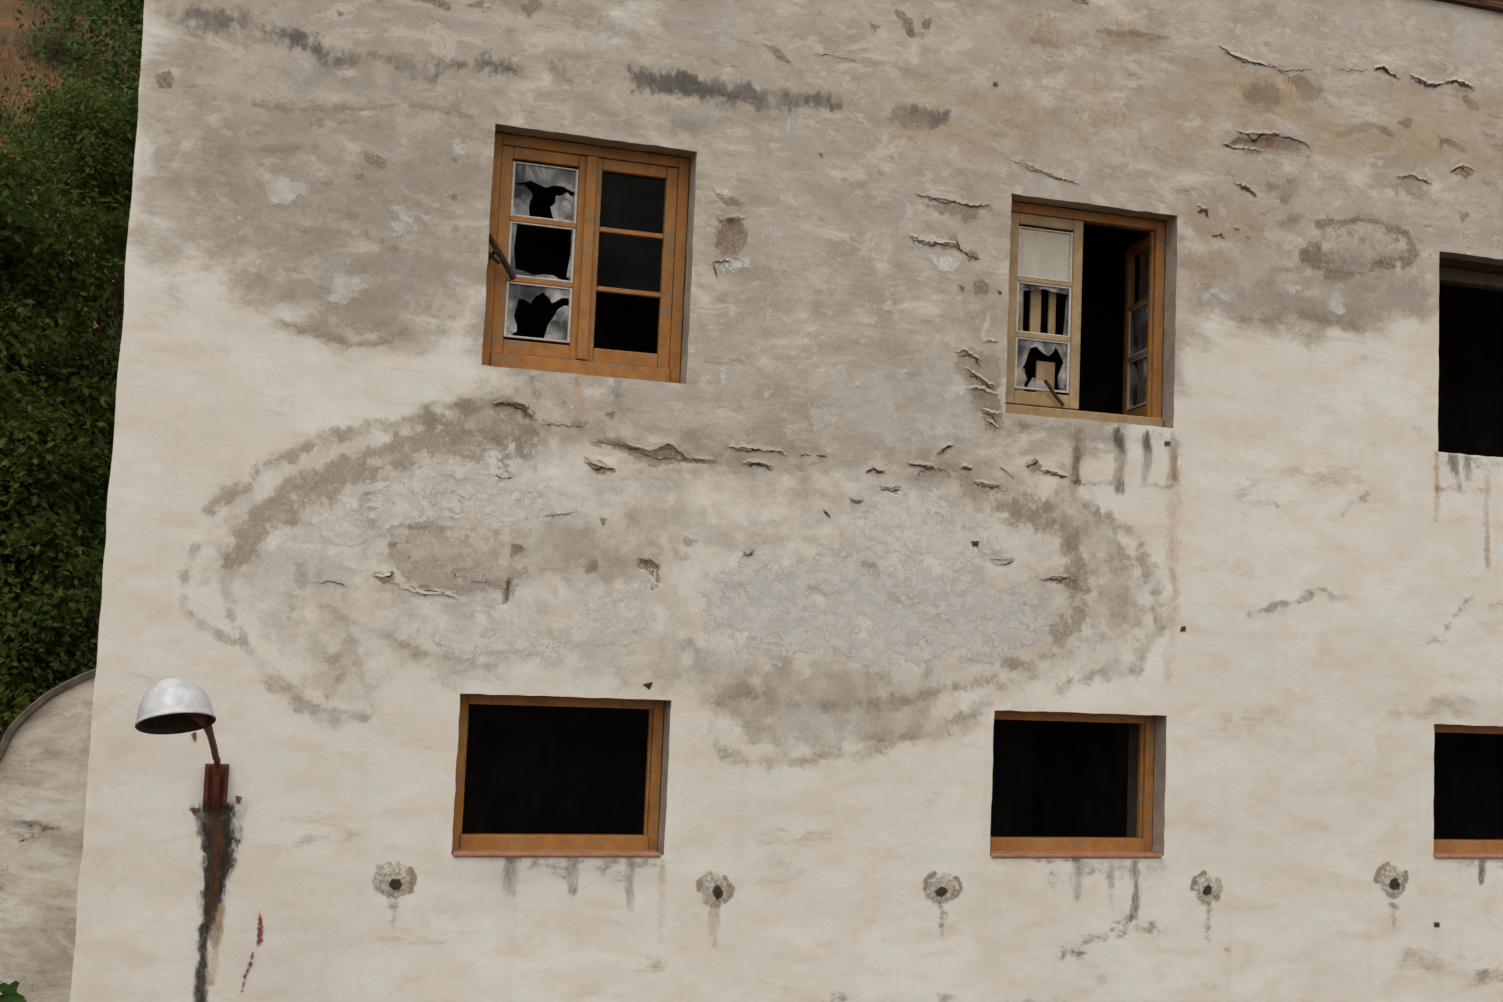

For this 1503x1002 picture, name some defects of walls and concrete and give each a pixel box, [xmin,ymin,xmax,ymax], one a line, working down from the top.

water stain [628,64,767,108]
spalling [1223,129,1312,155]
spalling [974,278,1002,294]
peeling [955,337,1001,429]
spalling [491,396,715,474]
peeling [866,442,1002,492]
spalling [461,540,527,604]
spalling [636,555,660,590]
spalling [971,541,1015,566]
spalling [1041,572,1080,589]
corrosion [191,796,242,1002]